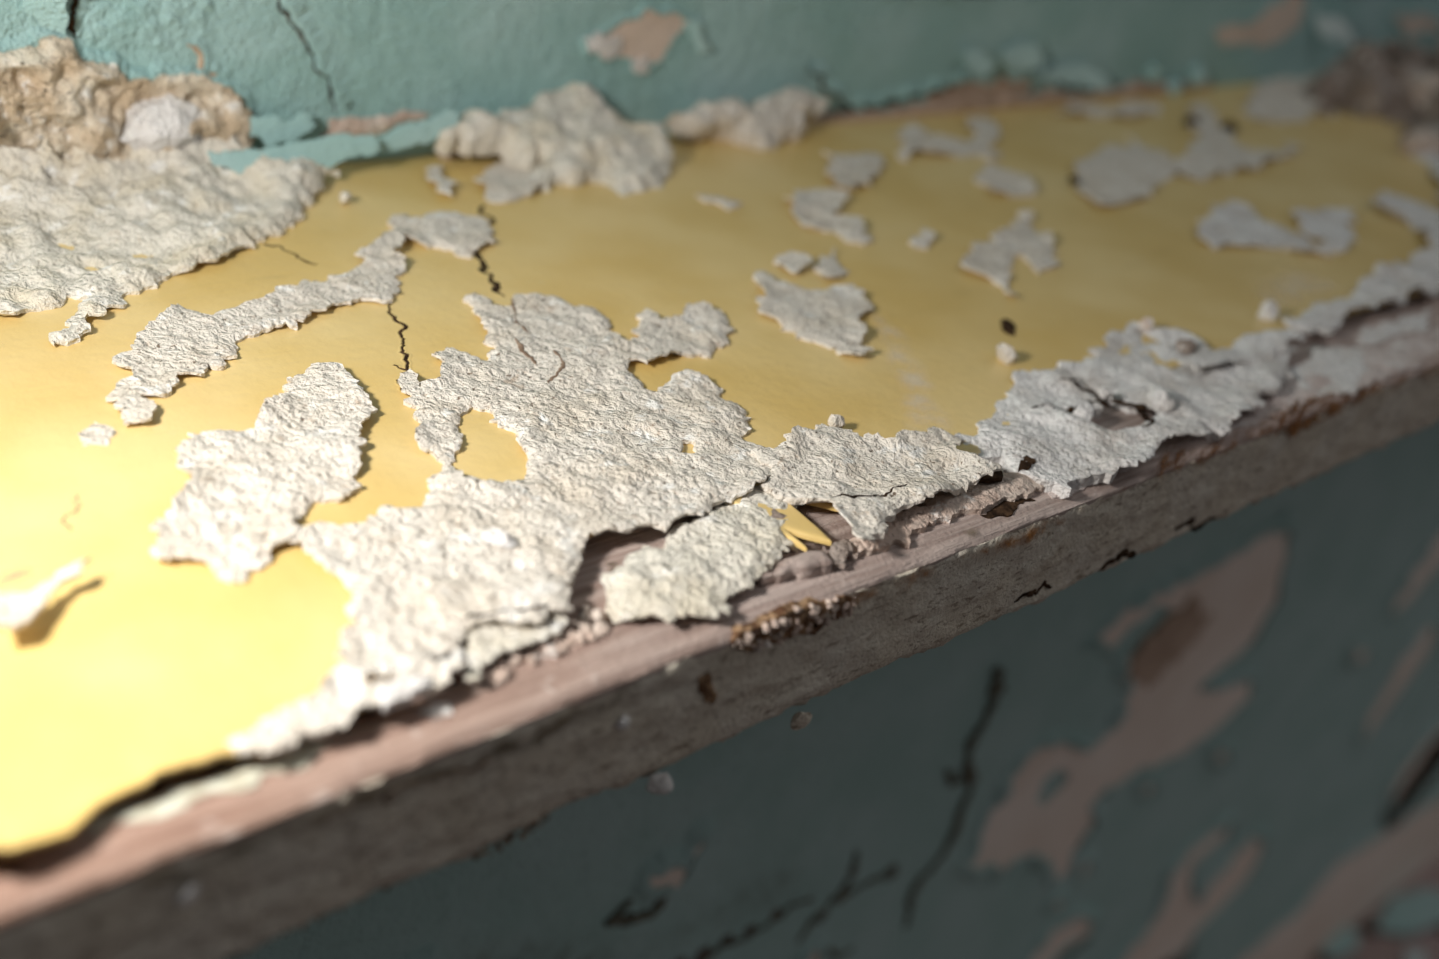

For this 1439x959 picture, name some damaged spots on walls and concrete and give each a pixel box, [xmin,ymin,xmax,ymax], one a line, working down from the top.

flaking render [0,0,459,175]
peeling [78,162,543,447]
crack [277,0,353,113]
crack [385,293,416,394]
peeling [150,151,1439,758]
peeling [752,109,1061,356]
peeling [1068,74,1322,206]
peeling [0,555,91,630]
crack [604,894,668,928]
crack [677,667,1007,959]
peeling [951,510,1295,890]
peeling [1237,722,1439,959]